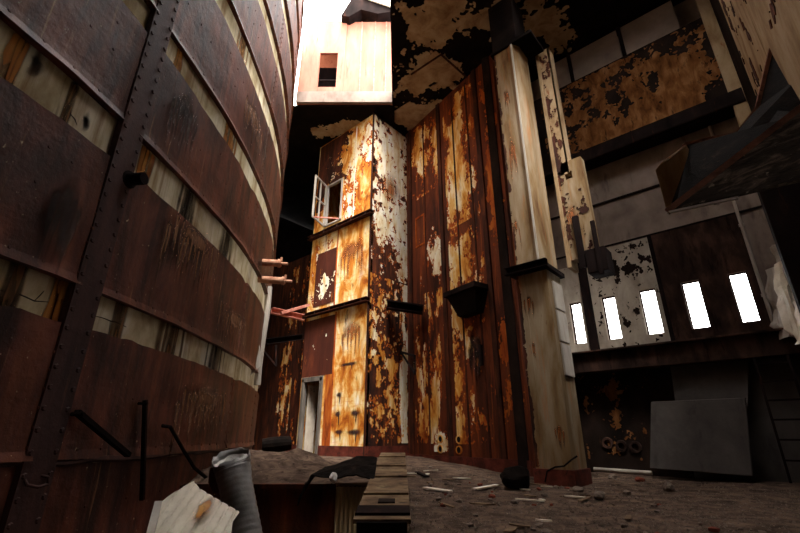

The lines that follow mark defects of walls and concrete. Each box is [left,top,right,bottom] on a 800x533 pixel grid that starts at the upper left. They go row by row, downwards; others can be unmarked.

corrosion [0,33,30,84]
corrosion [59,81,79,123]
peeling [514,0,723,155]
peeling [558,172,589,214]
peeling [310,0,504,452]
corrosion [158,214,220,293]
corrosion [341,243,363,274]
corrosion [0,262,28,307]
peeling [591,241,653,334]
corrosion [109,302,128,339]
corrosion [342,323,360,352]
corrosion [335,393,360,442]